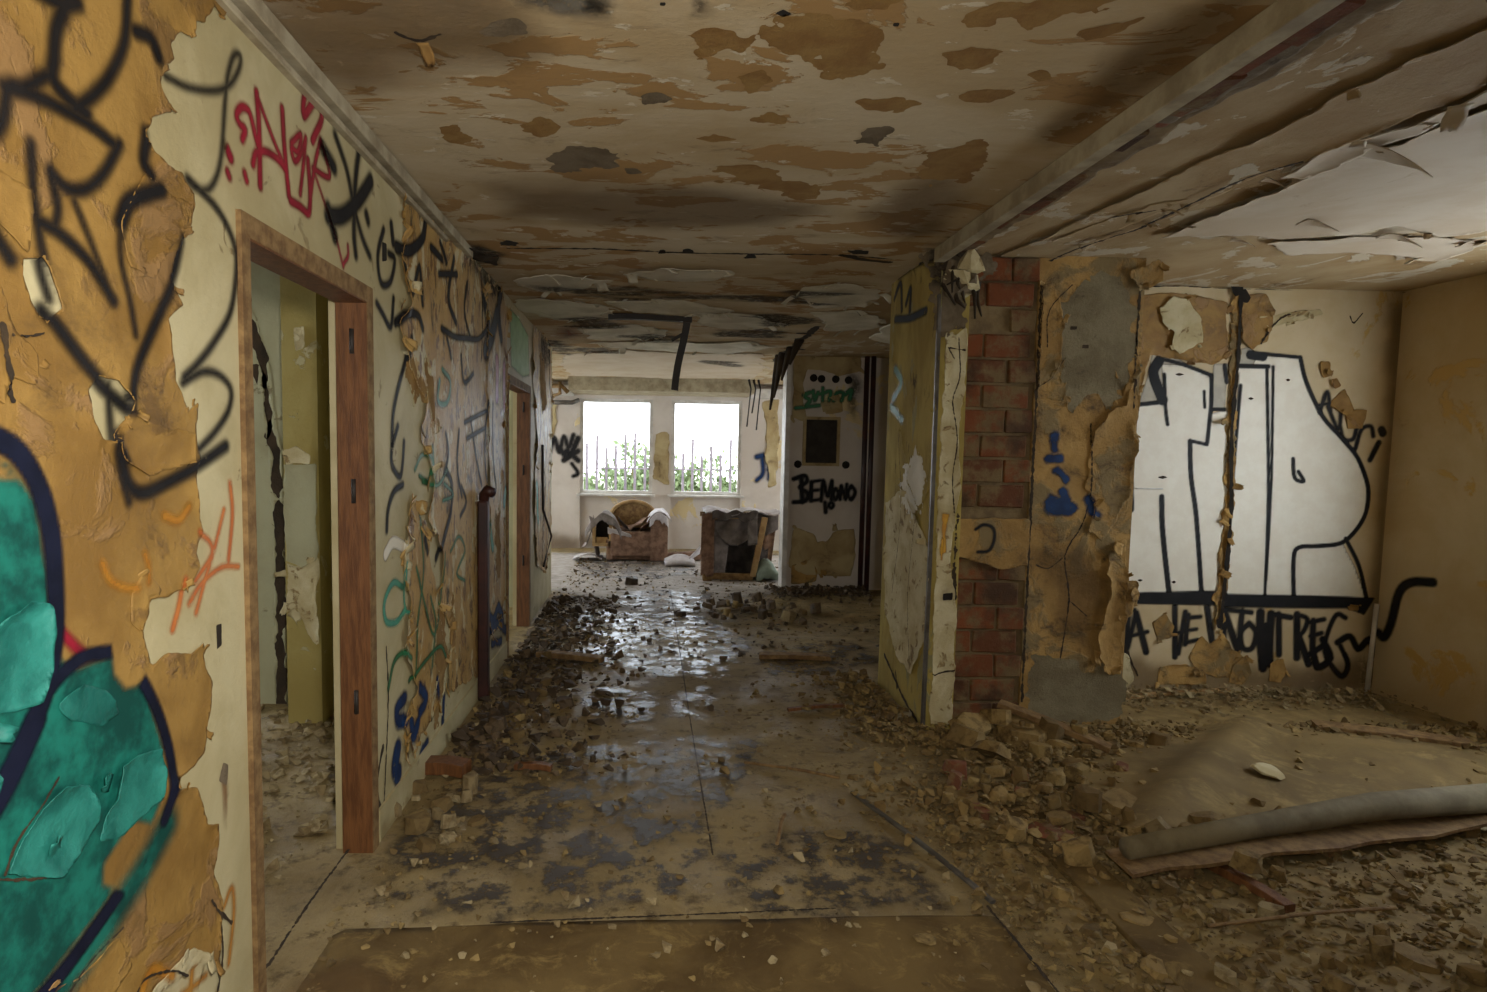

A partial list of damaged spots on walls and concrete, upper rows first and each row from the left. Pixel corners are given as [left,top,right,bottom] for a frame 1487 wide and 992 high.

peeling [0,0,228,992]
crack [252,312,288,704]
crack [378,646,389,807]
peeling [382,0,1487,766]
crack [1020,161,1303,702]